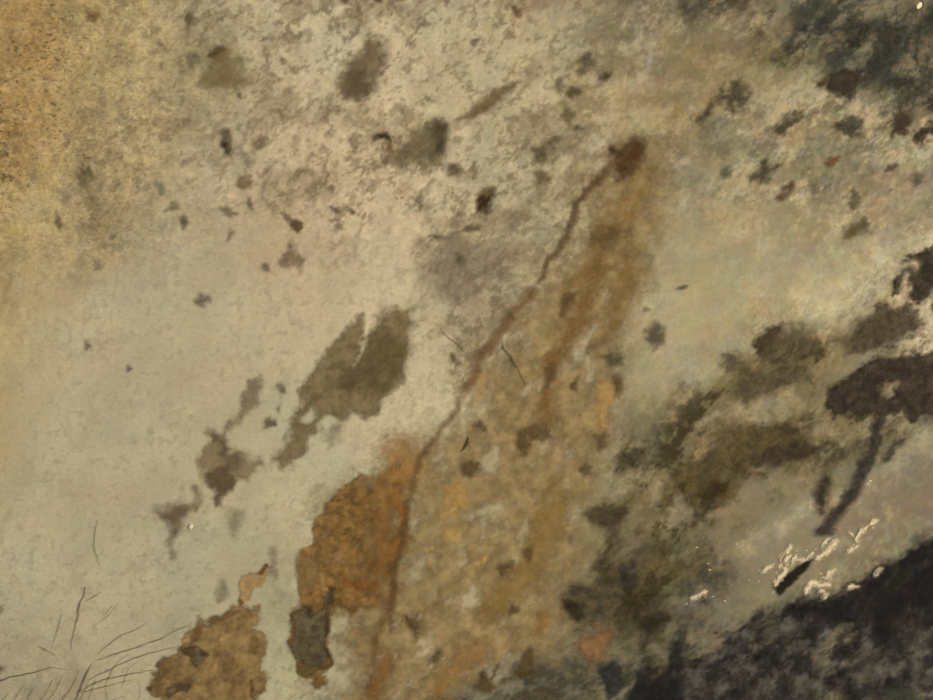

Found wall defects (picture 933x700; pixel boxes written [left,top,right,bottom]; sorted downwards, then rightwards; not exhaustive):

damp [199,379,263,506]
damp [276,310,412,468]
corrosion [334,140,663,700]
mould [814,246,933,535]
crack [76,626,187,699]
damp [160,505,197,555]
peeling [147,551,275,700]
peeling [288,474,382,688]
damp [601,661,624,698]
damp [631,540,933,700]